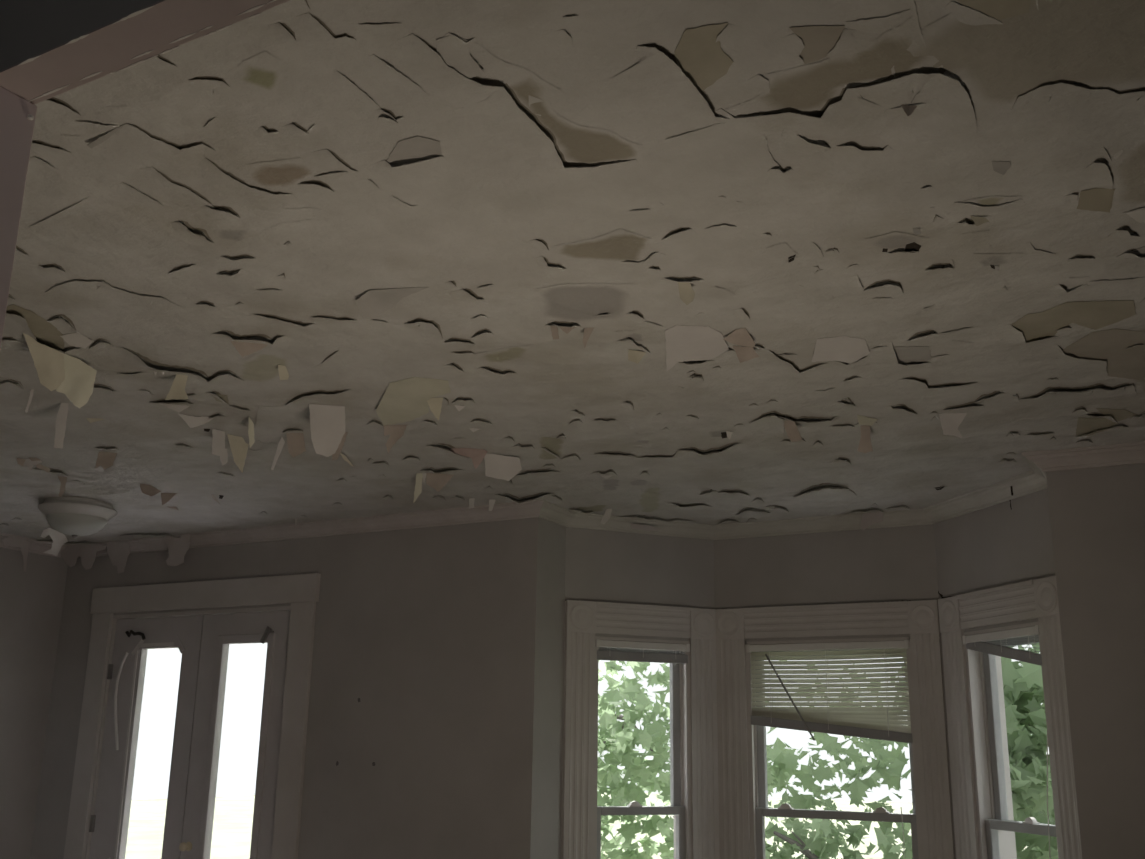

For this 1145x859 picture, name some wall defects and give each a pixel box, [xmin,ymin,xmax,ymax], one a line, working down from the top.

peeling [0,304,389,482]
peeling [27,71,450,279]
peeling [404,281,534,376]
peeling [367,409,618,524]
peeling [388,33,643,194]
peeling [525,225,737,388]
peeling [667,483,911,523]
peeling [604,9,977,176]
peeling [594,276,1145,466]
flaking render [864,228,928,256]
peeling [1011,79,1145,132]
peeling [1063,147,1145,263]